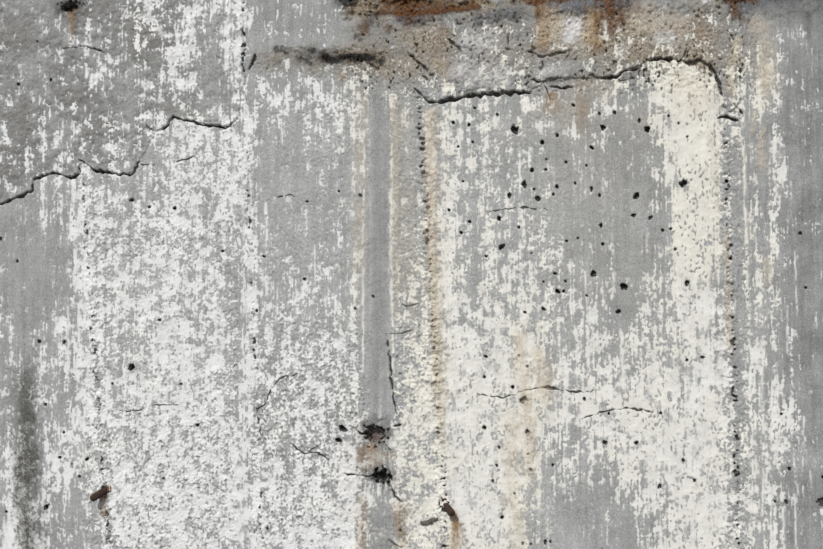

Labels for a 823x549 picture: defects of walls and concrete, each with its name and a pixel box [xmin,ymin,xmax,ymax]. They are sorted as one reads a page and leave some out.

rust [379,0,479,23]
damp [300,48,385,69]
crack [408,50,571,104]
crack [591,47,743,122]
crack [146,116,232,131]
crack [0,160,155,205]
damp [16,381,38,549]